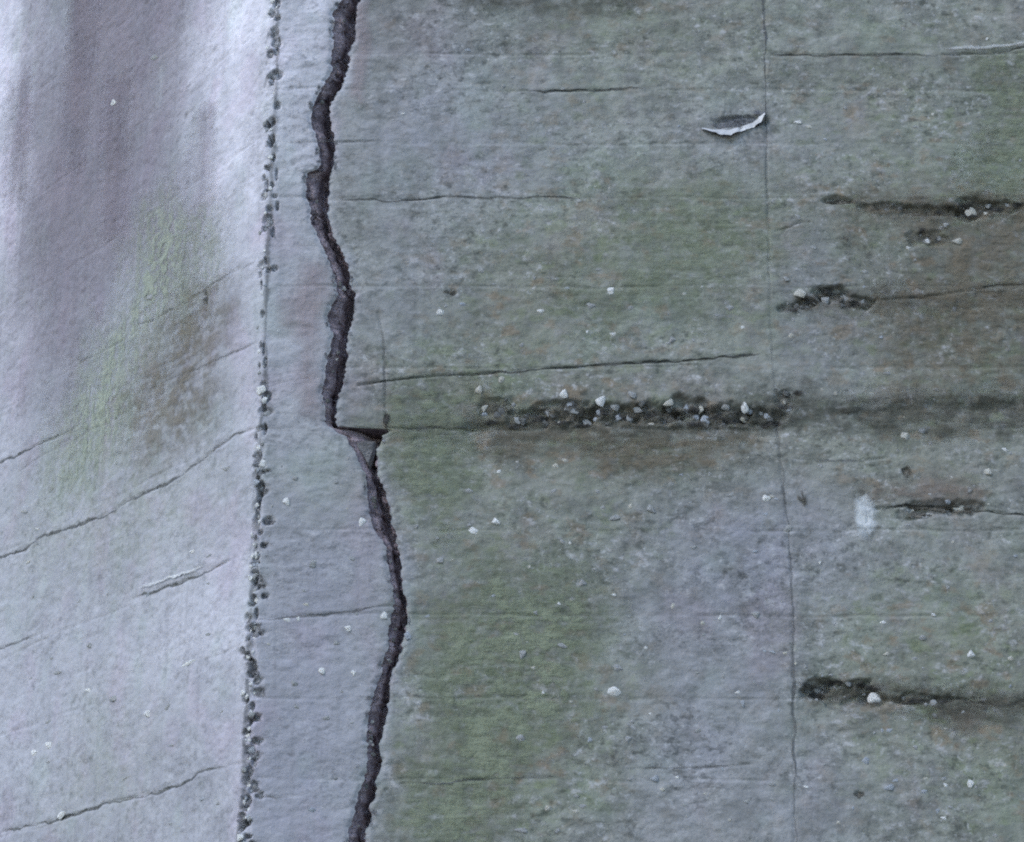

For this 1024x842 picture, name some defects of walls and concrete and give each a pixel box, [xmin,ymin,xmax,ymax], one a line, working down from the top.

damp [32,0,172,287]
peeling [702,110,766,136]
crack [274,0,759,842]
hole [629,404,711,423]